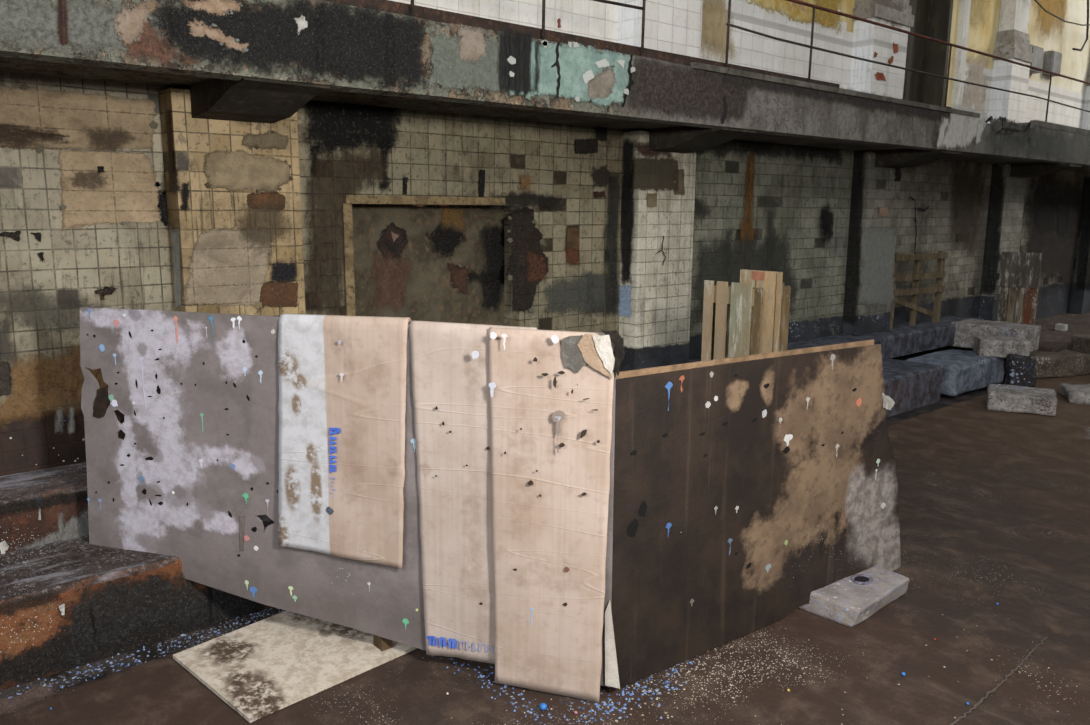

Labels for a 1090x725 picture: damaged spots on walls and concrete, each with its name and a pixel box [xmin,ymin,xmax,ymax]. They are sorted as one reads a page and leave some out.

peeling [0,0,161,59]
spalling [183,0,249,53]
peeling [429,24,635,107]
peeling [183,226,271,309]